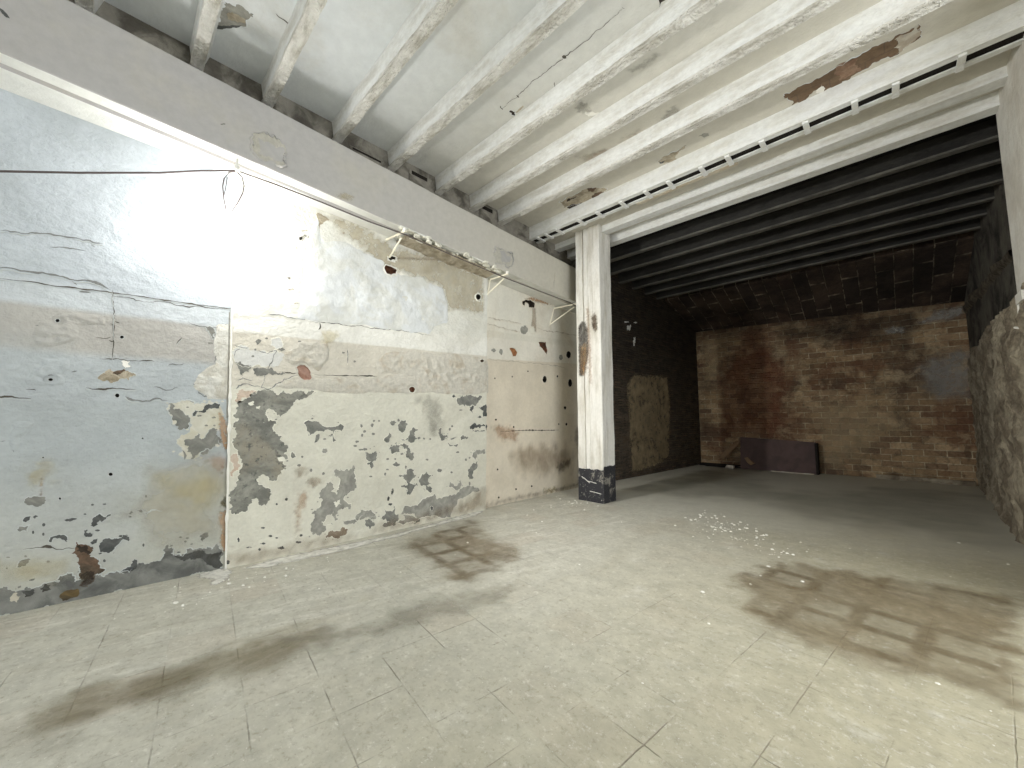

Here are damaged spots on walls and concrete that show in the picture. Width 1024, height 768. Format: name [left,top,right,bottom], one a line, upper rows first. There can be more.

flaking render [217,2,255,30]
crack [500,8,623,110]
flaking render [783,24,922,105]
crack [0,230,103,251]
flaking render [296,212,329,249]
flaking render [383,226,501,278]
flaking render [558,187,607,209]
crack [0,267,298,403]
peeling [166,337,487,544]
flaking render [0,496,230,616]